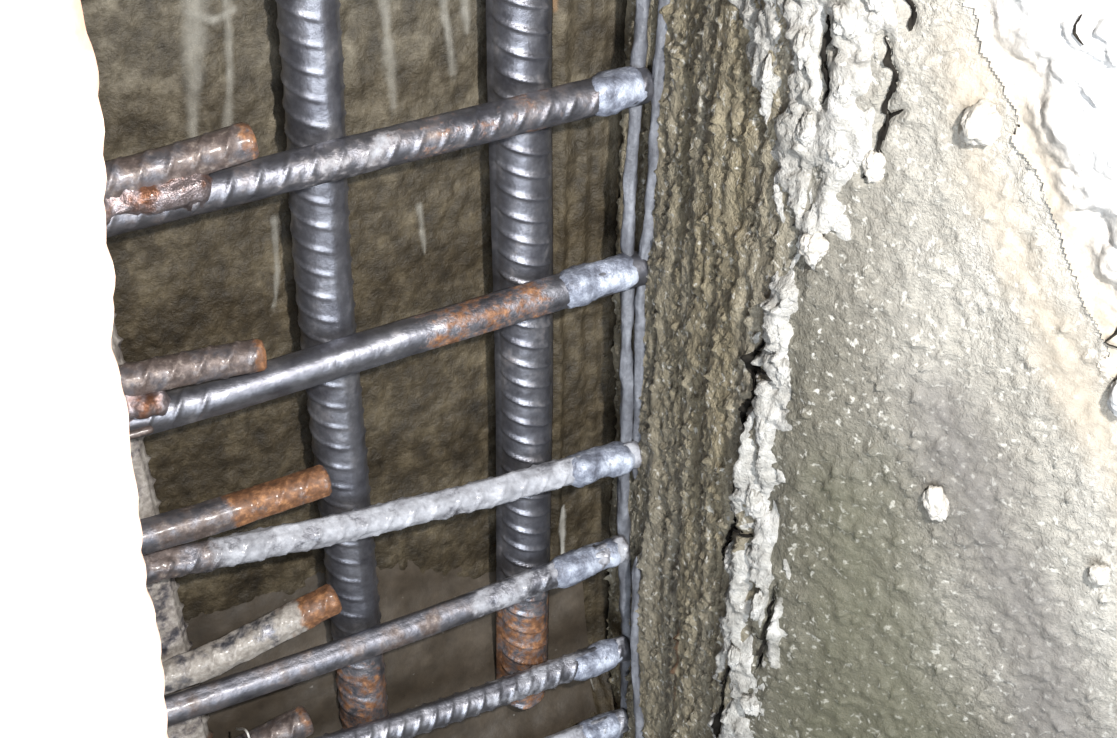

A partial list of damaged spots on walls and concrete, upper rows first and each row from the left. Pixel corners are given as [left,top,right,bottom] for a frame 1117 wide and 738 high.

spalling [275,0,347,151]
spalling [486,0,553,102]
crack [820,14,835,104]
crack [861,0,917,179]
crack [1072,13,1084,45]
spalling [111,312,126,365]
spalling [288,178,357,350]
spalling [489,127,553,292]
crack [738,339,767,429]
spalling [130,313,642,738]
crack [721,483,753,561]
crack [711,586,776,738]